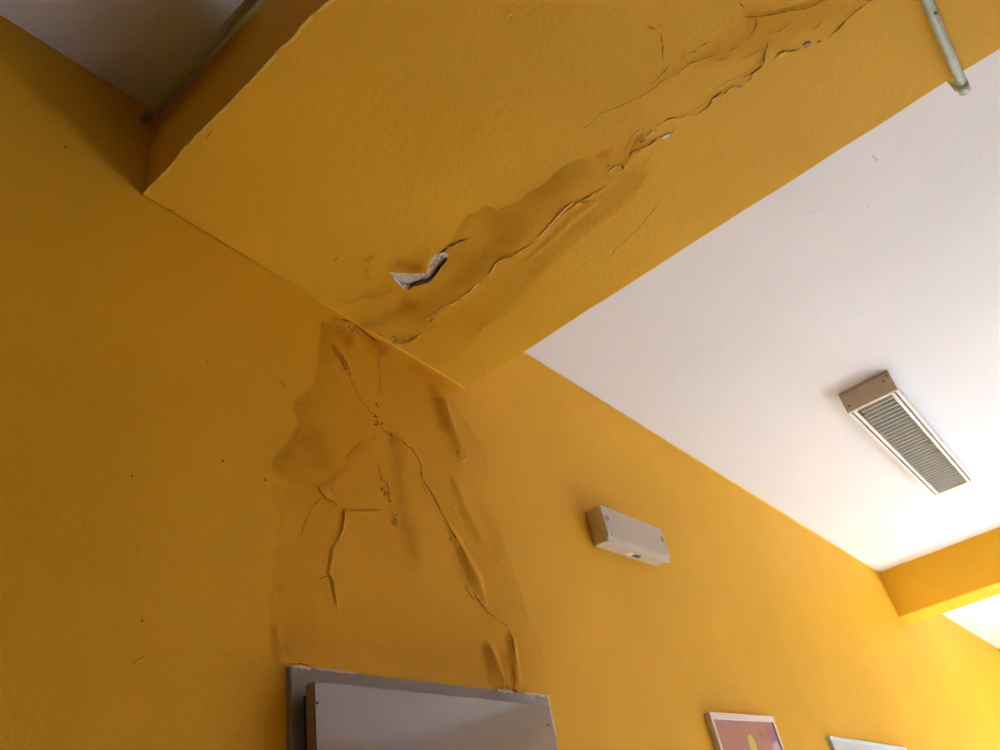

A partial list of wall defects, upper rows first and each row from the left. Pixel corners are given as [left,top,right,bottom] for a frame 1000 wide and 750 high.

spalling [389,239,467,290]
crack [331,0,872,692]
crack [301,467,400,535]